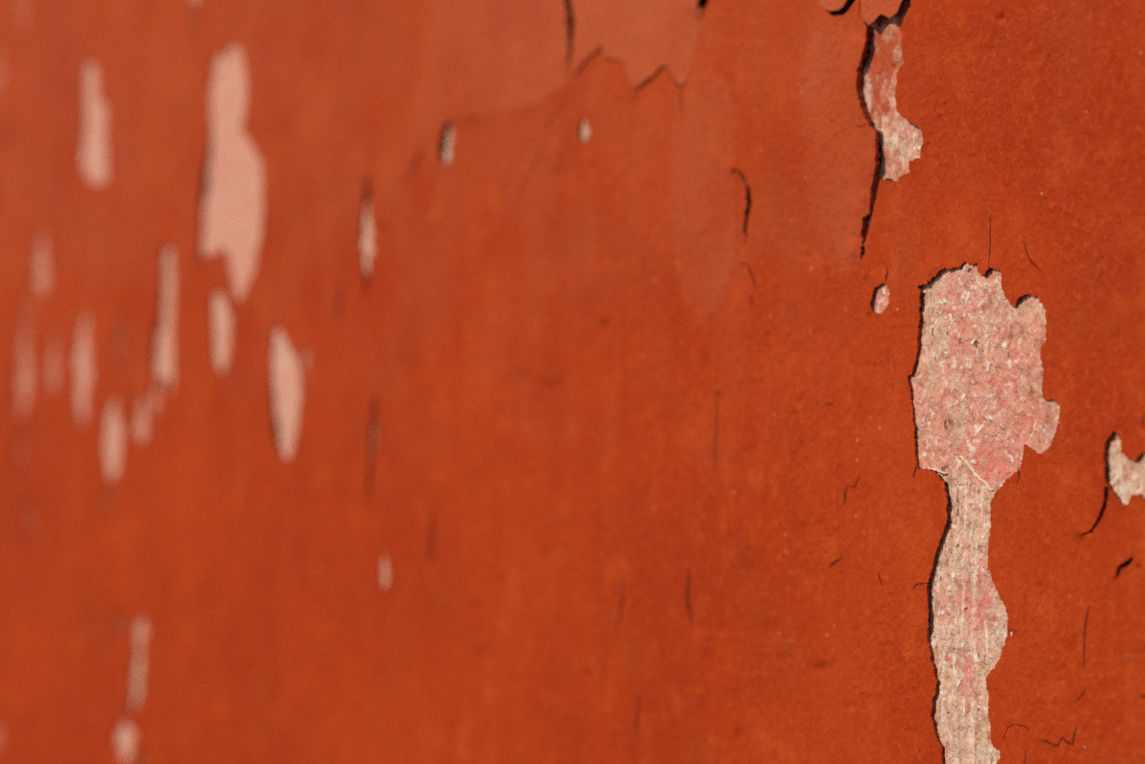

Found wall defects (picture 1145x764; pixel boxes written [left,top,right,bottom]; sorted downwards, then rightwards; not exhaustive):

crack [565,0,622,65]
peeling [79,60,107,186]
peeling [819,0,923,260]
peeling [199,45,263,373]
crack [734,169,757,305]
peeling [103,246,174,482]
peeling [270,326,300,459]
peeling [907,261,1060,764]
crack [1082,487,1113,535]
peeling [1103,431,1145,505]
crack [1116,558,1133,577]